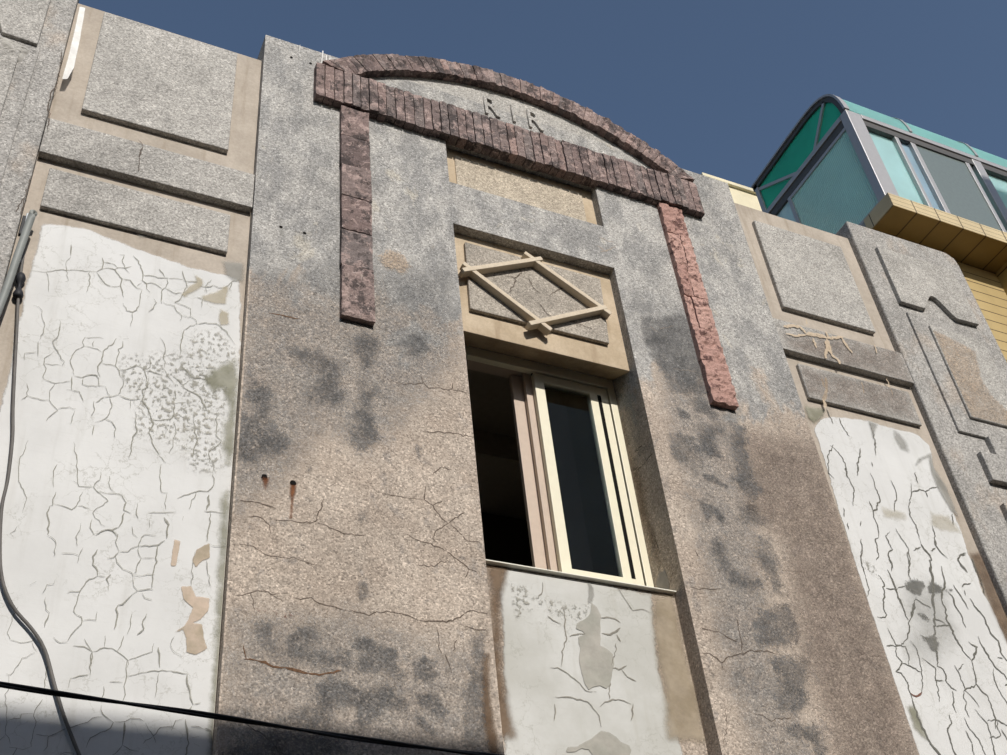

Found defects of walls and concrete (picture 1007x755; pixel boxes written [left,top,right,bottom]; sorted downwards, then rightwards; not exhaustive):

leakage [183,262,242,324]
leakage [242,250,446,477]
leakage [784,319,853,364]
peeling [171,540,180,566]
crack [0,246,366,755]
peeling [178,586,209,654]
peeling [193,544,210,566]
crack [235,590,488,673]
crack [381,467,479,577]
crack [536,582,651,724]
crack [827,410,1007,755]
spalling [567,731,631,755]